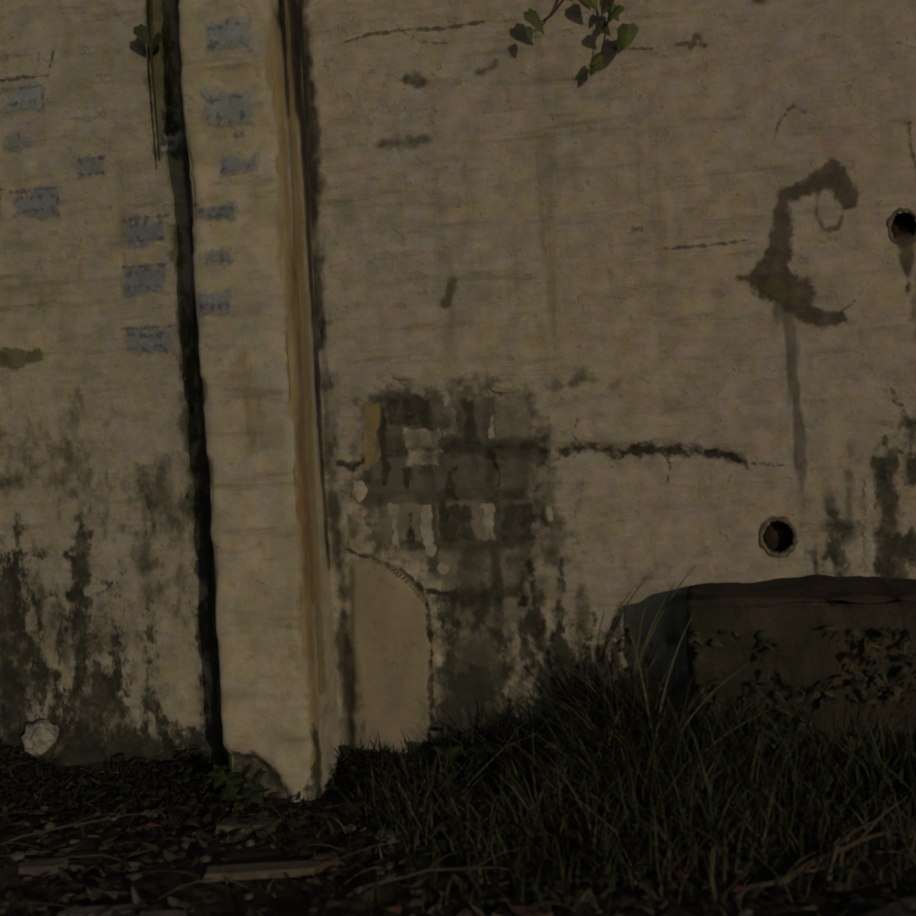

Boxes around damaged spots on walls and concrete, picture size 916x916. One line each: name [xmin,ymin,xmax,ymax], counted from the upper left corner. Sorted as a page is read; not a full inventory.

damp [162,54,193,268]
damp [738,159,859,326]
damp [896,234,915,292]
damp [0,282,231,771]
crack [337,452,408,472]
spalling [352,373,564,699]
crack [489,421,756,487]
damp [811,435,916,579]
damp [420,545,634,767]